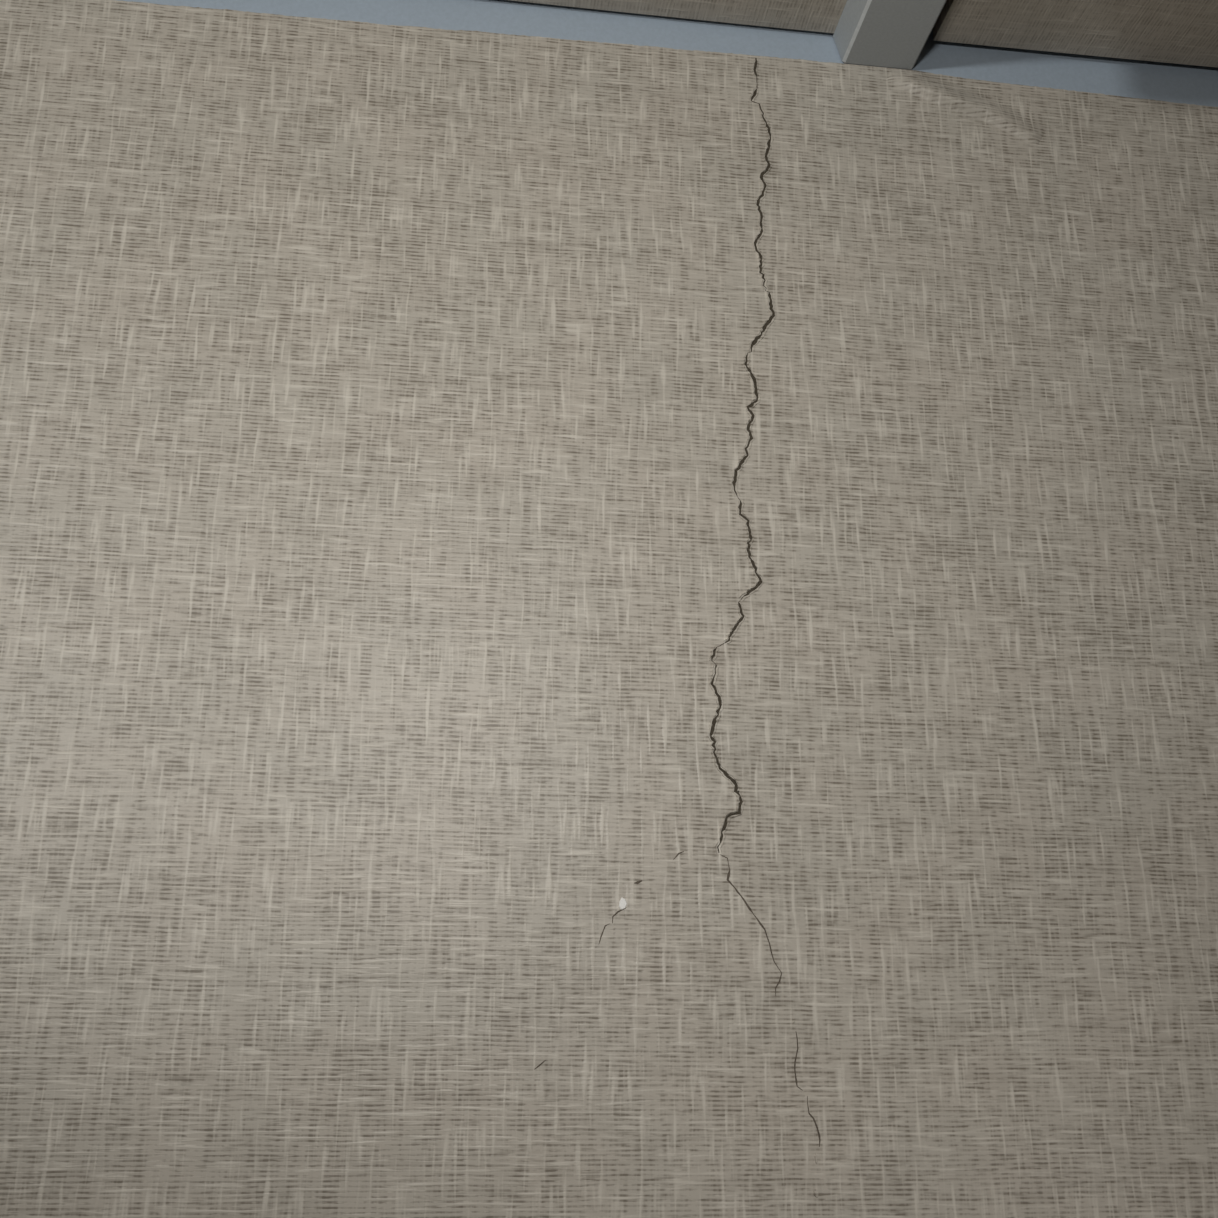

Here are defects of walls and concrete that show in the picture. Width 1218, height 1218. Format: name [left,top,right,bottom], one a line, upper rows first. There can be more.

crack [707,58,782,996]
crack [599,880,642,943]
crack [793,1019,820,1198]